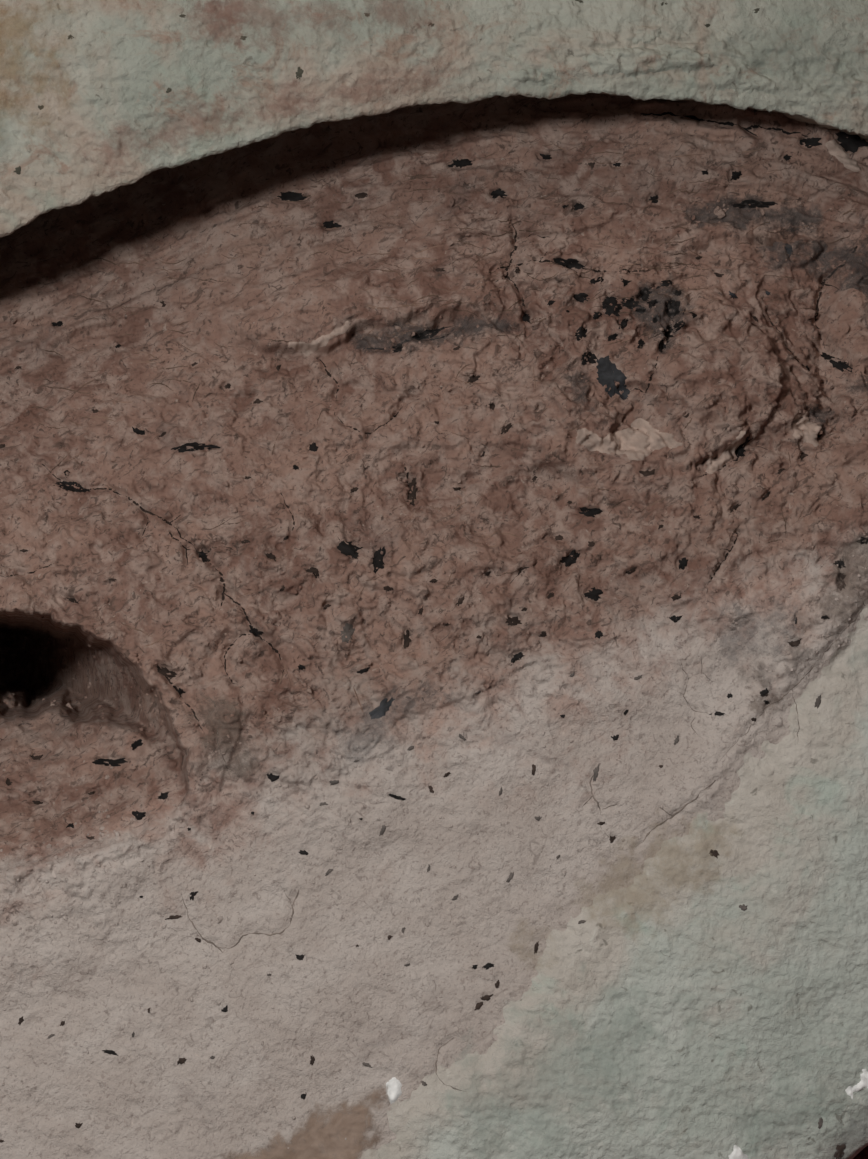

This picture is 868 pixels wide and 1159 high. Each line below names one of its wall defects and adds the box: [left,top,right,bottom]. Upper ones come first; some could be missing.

peeling [825,139,861,172]
peeling [288,320,350,356]
peeling [596,355,630,400]
peeling [575,418,683,461]
peeling [705,430,746,474]
peeling [792,411,822,447]
crack [42,464,284,776]
spalling [0,618,187,872]
damp [234,1092,387,1159]